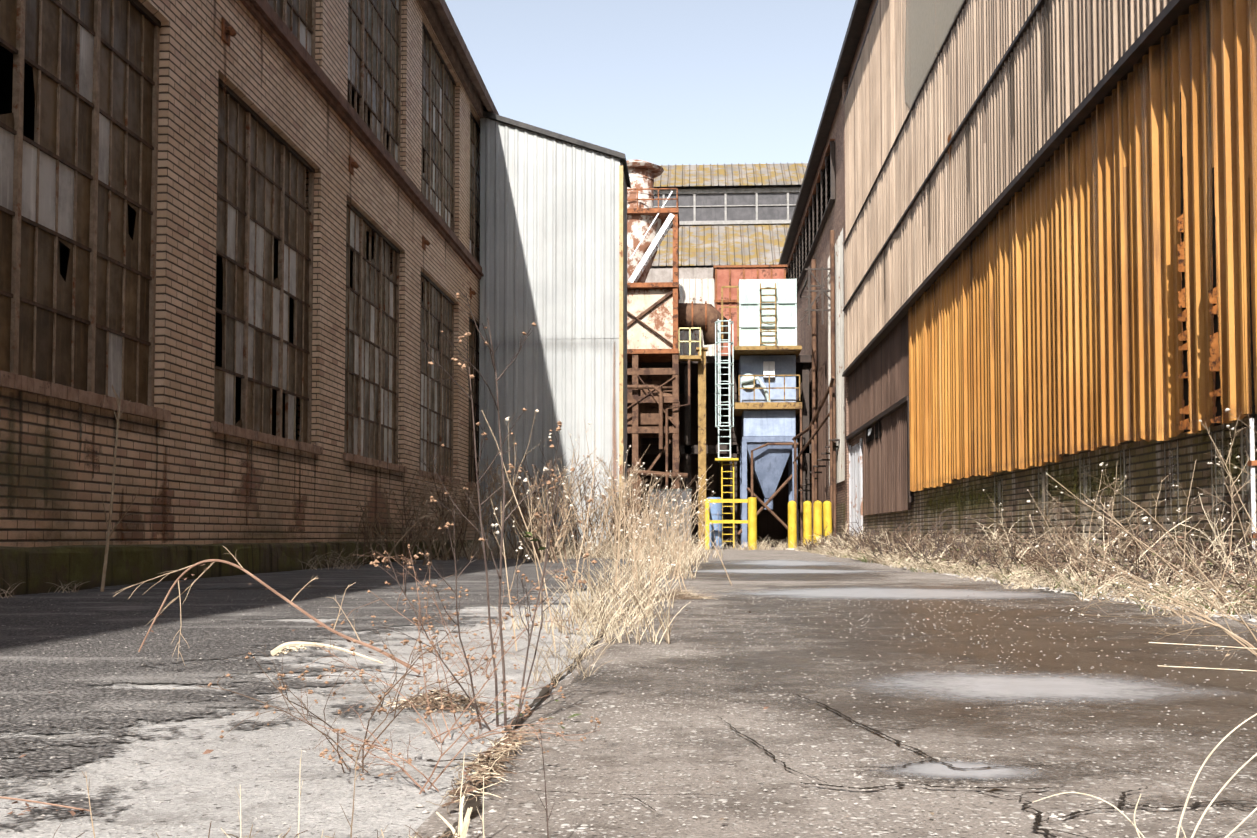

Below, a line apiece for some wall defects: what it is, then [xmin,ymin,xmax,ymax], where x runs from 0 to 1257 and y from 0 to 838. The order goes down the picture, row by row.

crack [405,577,735,838]
crack [720,691,1257,838]